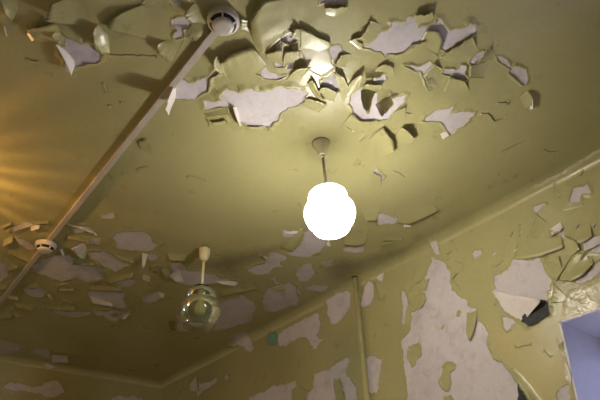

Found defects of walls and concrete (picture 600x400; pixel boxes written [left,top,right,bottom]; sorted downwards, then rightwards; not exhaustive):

peeling [26,0,152,79]
peeling [156,2,207,64]
peeling [165,0,534,158]
peeling [563,180,595,211]
peeling [0,220,353,354]
peeling [360,272,386,310]
peeling [399,240,542,400]
peeling [489,202,600,334]
peeling [0,378,67,400]
peeling [248,353,361,400]
peeling [365,352,385,397]
peeling [554,362,576,400]